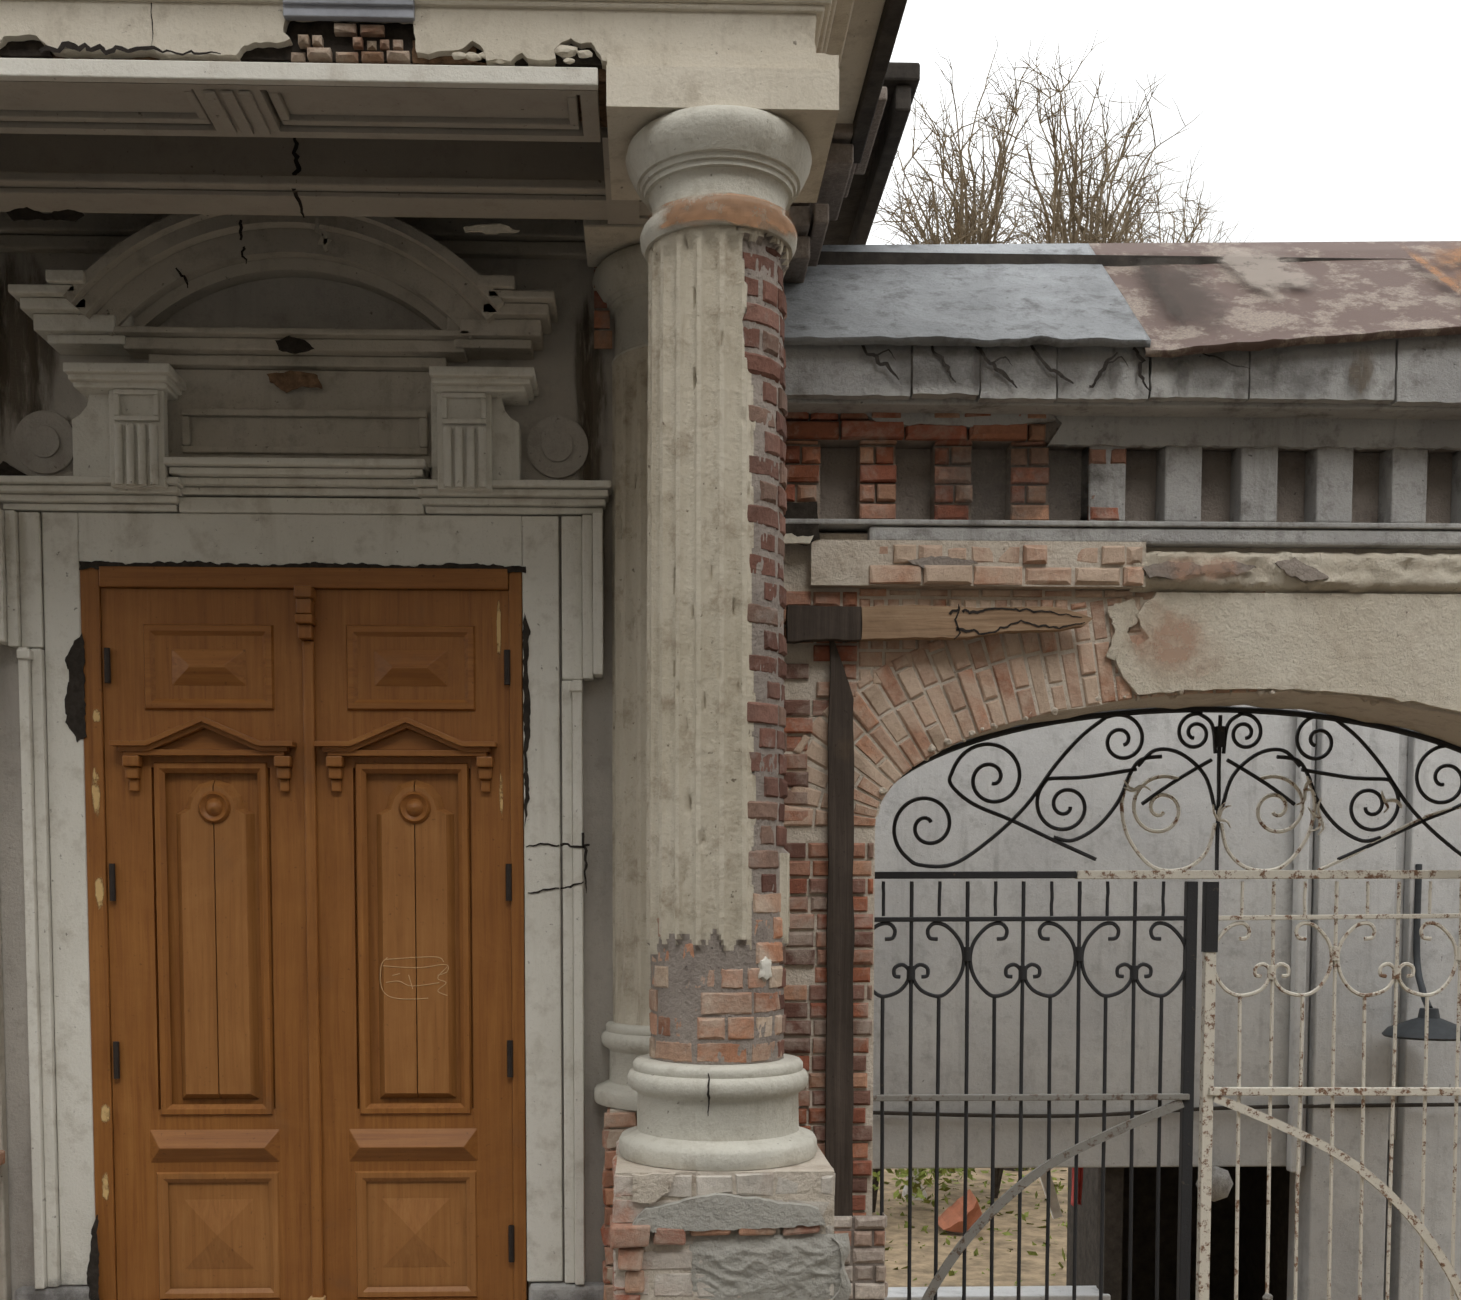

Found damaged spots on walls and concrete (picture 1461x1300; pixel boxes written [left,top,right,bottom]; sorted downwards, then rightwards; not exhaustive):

flaking render [286,21,415,64]
peeling [452,51,506,65]
crack [291,138,332,252]
crack [239,220,247,264]
crack [175,268,188,288]
spalling [267,336,322,393]
crack [861,345,899,380]
crack [931,345,1151,391]
flaking render [649,193,797,1063]
spalling [65,633,87,742]
crack [526,833,590,894]
spalling [610,1214,820,1300]